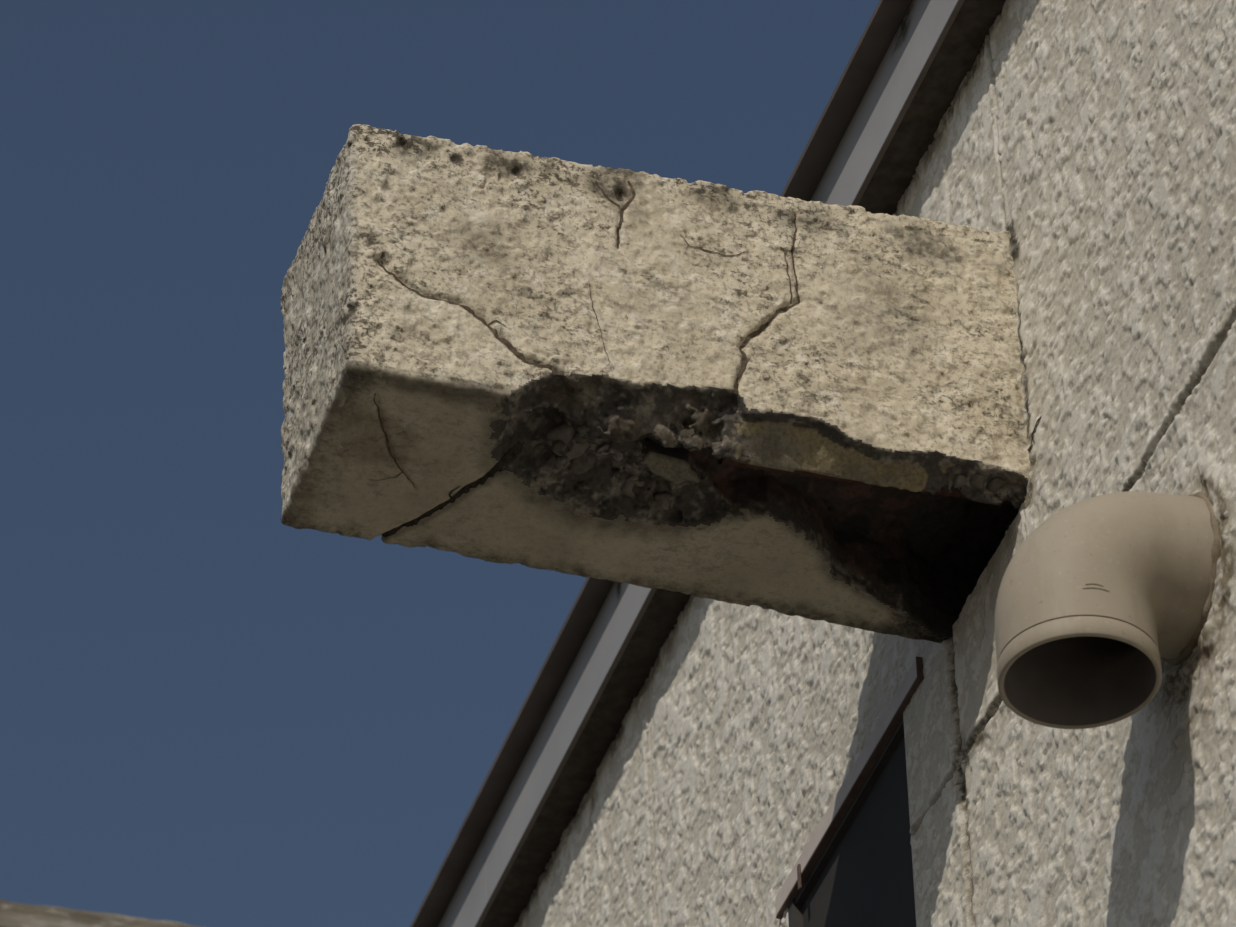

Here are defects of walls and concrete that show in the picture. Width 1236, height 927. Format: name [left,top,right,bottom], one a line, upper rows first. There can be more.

crack [596,181,635,248]
crack [680,234,754,256]
crack [376,260,564,375]
crack [589,283,610,362]
crack [734,214,800,394]
crack [373,393,525,537]
spalling [489,371,1029,638]